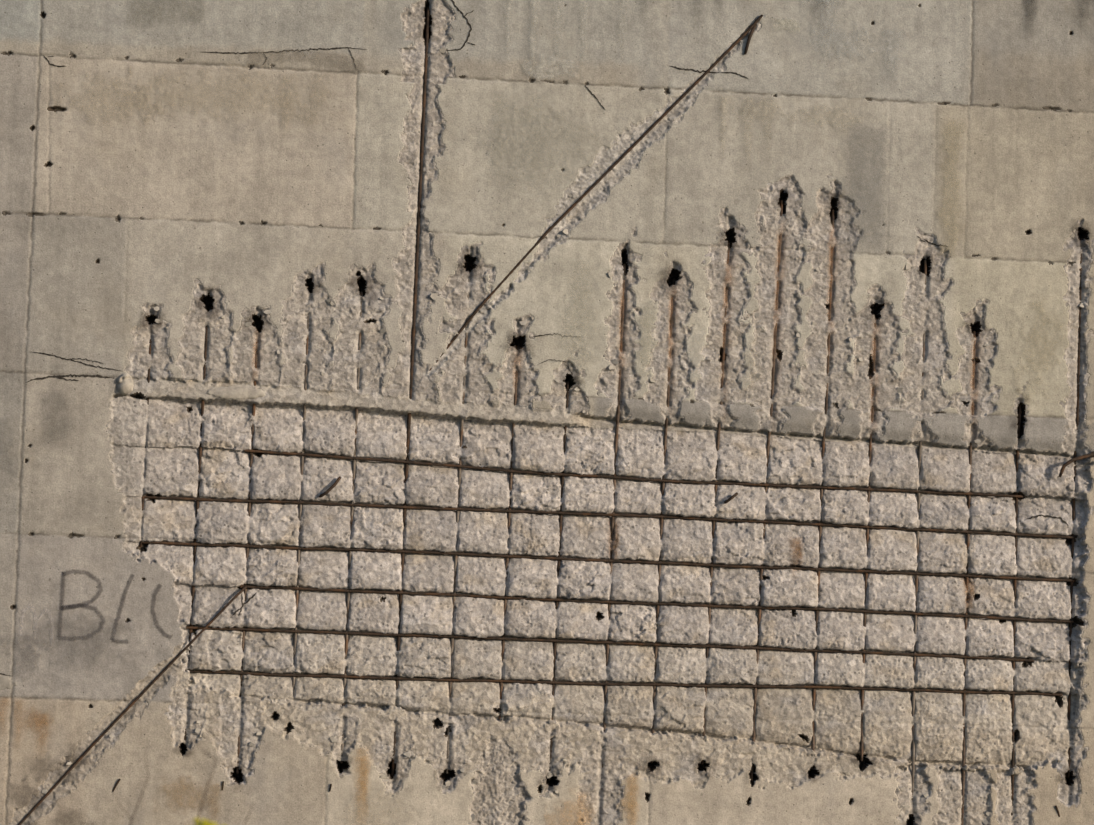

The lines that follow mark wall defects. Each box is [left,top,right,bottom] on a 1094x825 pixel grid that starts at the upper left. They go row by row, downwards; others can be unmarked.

spalling [142,541,1075,582]
spalling [247,585,1074,623]
spalling [206,627,1034,662]
spalling [189,670,1063,696]